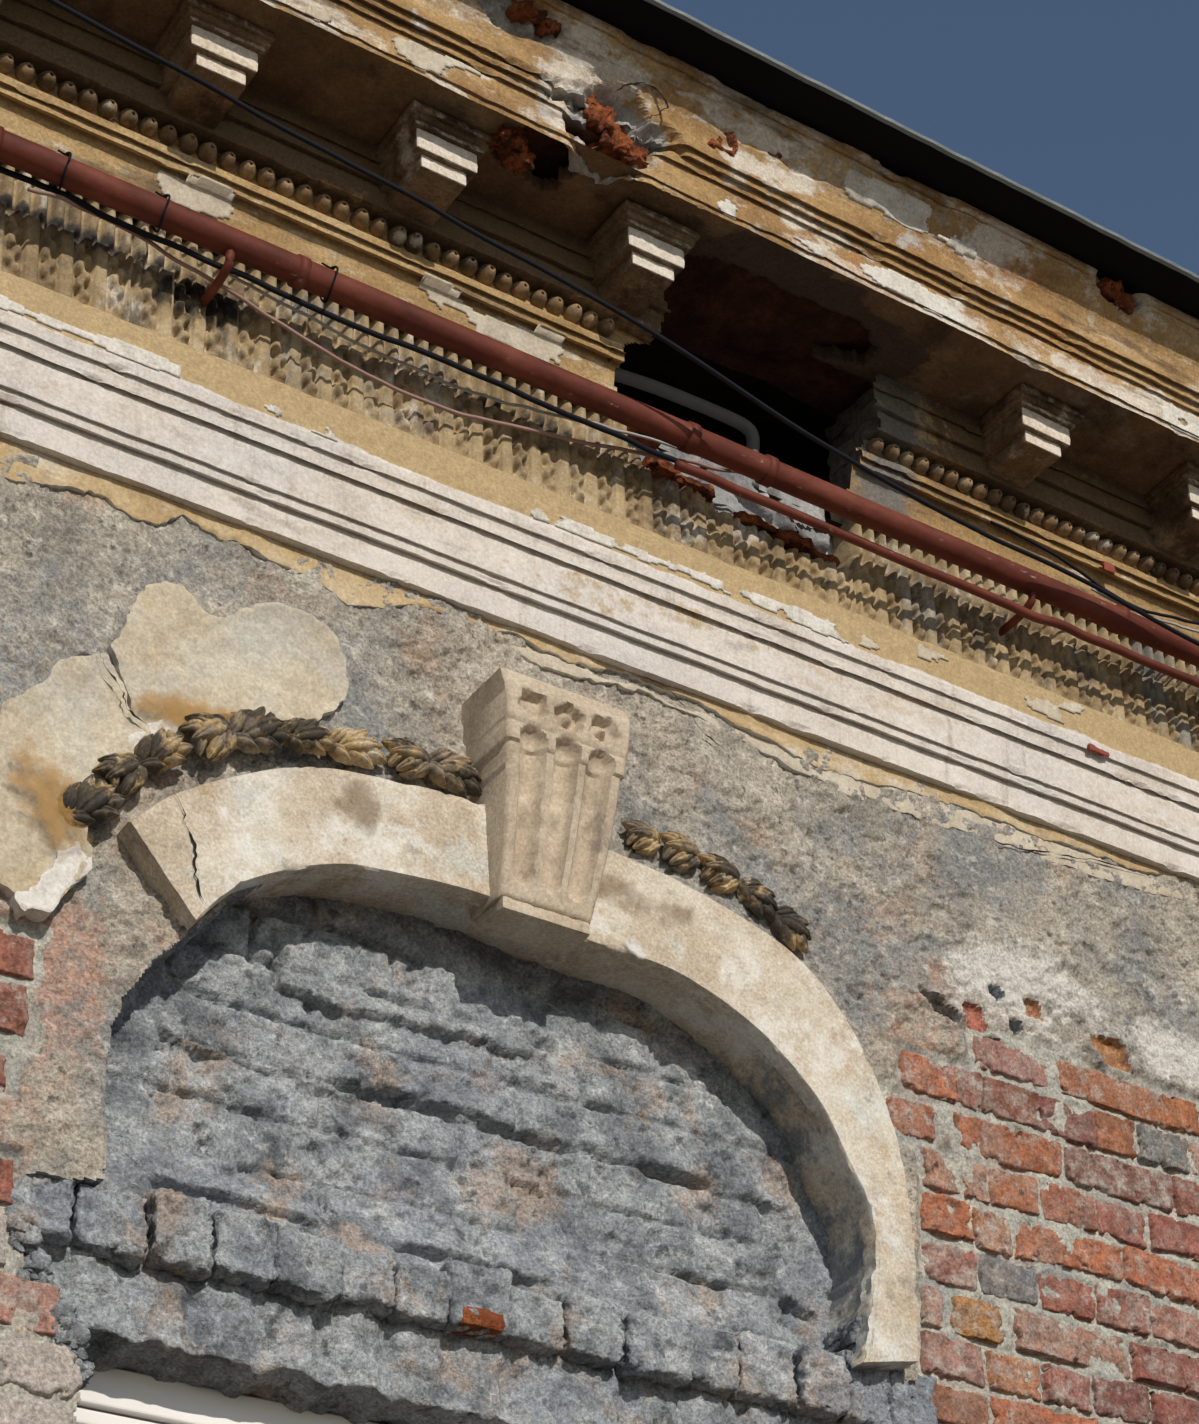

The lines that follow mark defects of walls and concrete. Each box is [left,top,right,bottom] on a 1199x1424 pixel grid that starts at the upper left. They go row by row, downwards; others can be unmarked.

spalling [578,94,649,169]
crack [615,82,669,119]
peeling [156,170,237,219]
peeling [0,294,181,378]
peeling [418,272,567,365]
spalling [1096,277,1135,315]
flaking render [0,437,446,613]
flaking render [468,616,1199,901]
flaking render [0,581,349,1101]
crack [172,790,204,901]
spalling [823,998,1199,1424]
spalling [0,1142,95,1424]